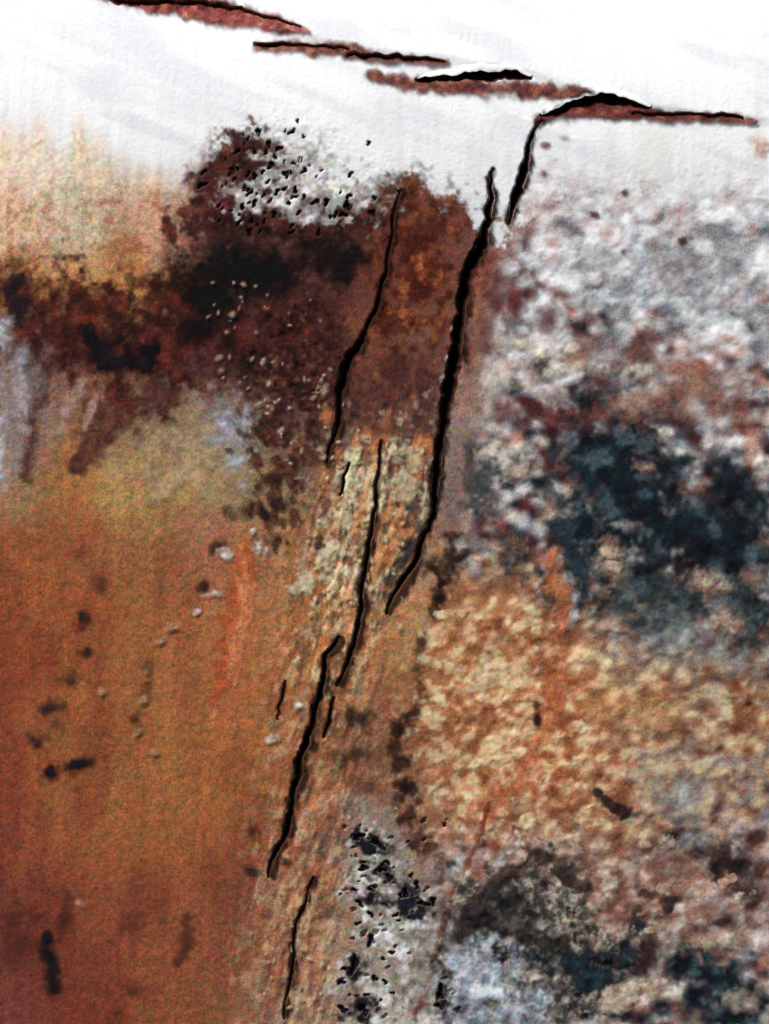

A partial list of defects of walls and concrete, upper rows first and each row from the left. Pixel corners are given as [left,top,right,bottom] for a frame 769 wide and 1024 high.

spalling [160,118,391,257]
corrosion [0,254,348,552]
corrosion [349,200,456,431]
crack [267,121,545,878]
damp [464,439,528,517]
corrosion [493,396,606,430]
damp [530,387,769,647]
crack [281,876,317,1018]
corrosion [411,548,571,1021]
spalling [290,532,756,1024]
damp [592,889,769,1024]
damp [666,829,766,906]